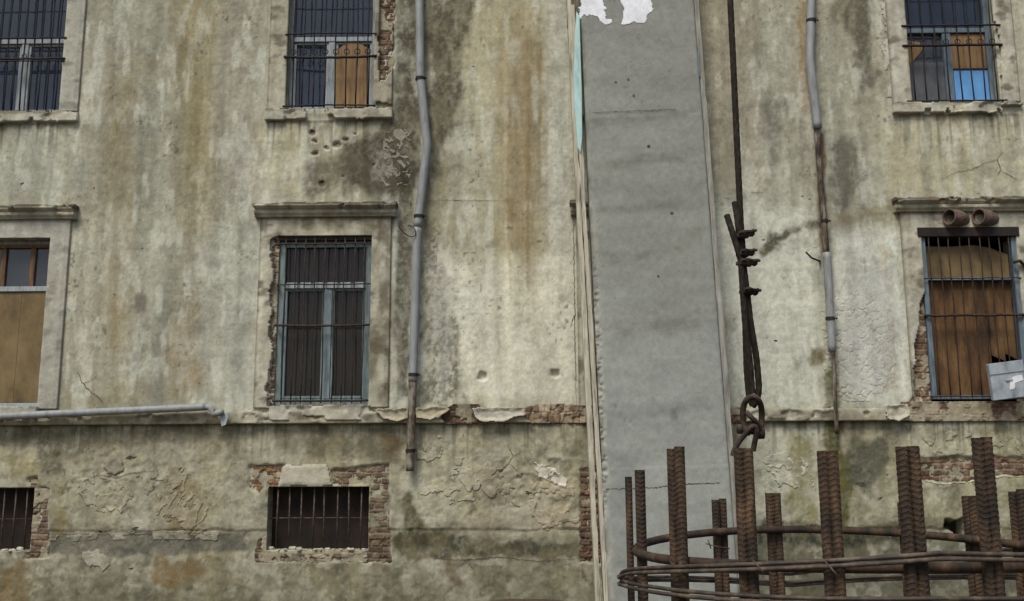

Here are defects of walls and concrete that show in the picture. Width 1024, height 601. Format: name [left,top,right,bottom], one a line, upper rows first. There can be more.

flaking render [378,0,396,80]
water stain [844,0,870,88]
water stain [343,0,471,207]
flaking render [266,238,280,406]
water stain [396,221,411,392]
flaking render [883,298,931,422]
peeling [375,406,450,422]
peeling [472,406,526,423]
peeling [25,465,219,572]
flaking render [249,464,285,493]
flaking render [255,464,392,563]
flaking render [420,456,601,563]